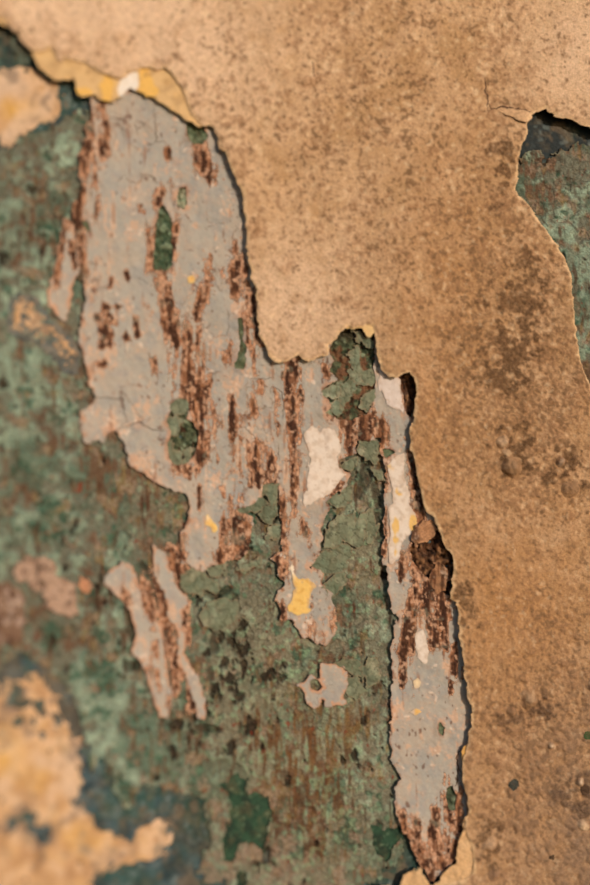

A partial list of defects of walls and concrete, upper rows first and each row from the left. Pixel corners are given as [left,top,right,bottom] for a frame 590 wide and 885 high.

corrosion [53,99,111,290]
corrosion [94,302,142,369]
corrosion [137,183,166,214]
corrosion [191,141,220,188]
peeling [515,141,590,384]
corrosion [145,214,310,621]
peeling [0,34,472,885]
corrosion [327,407,390,493]
corrosion [406,449,427,525]
corrosion [120,533,197,714]
corrosion [394,541,464,696]
corrosion [397,773,464,882]